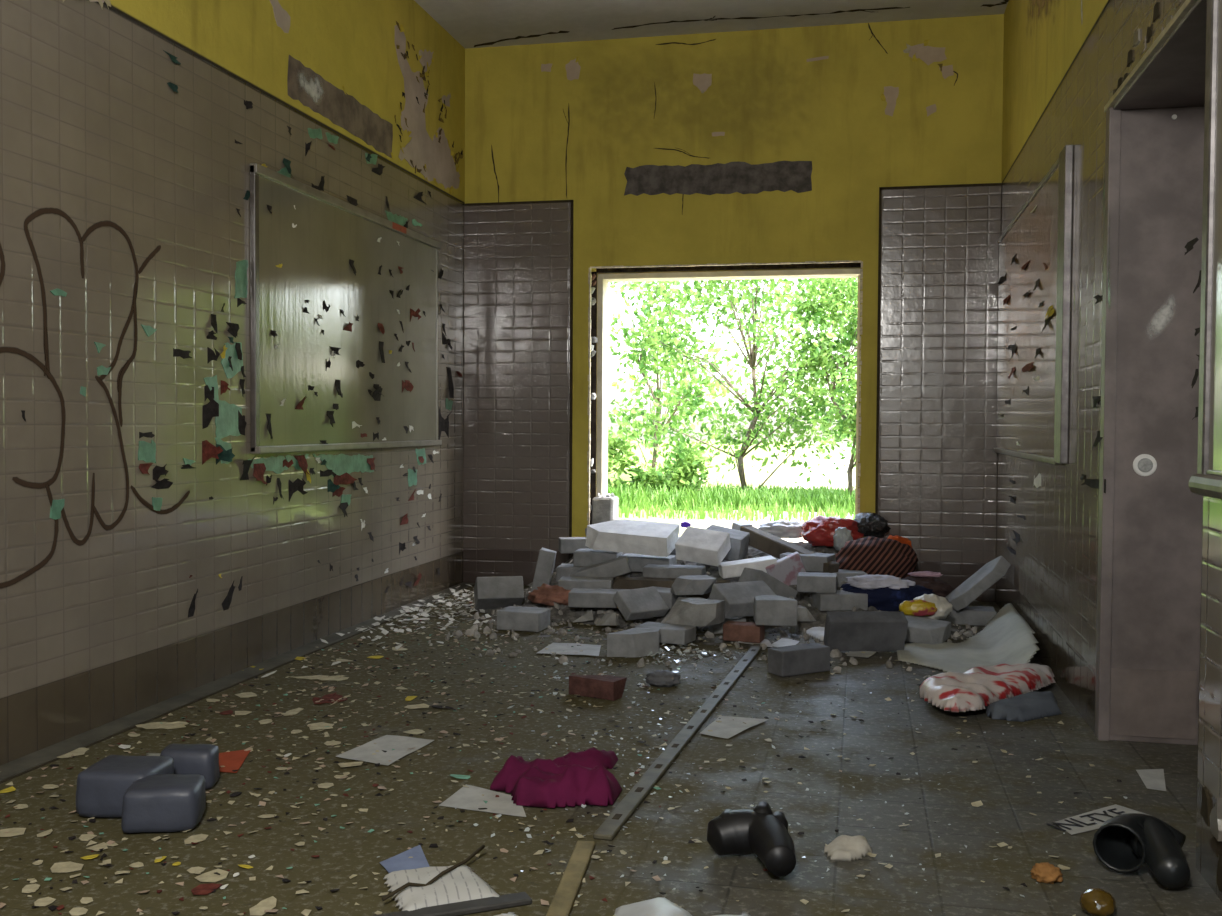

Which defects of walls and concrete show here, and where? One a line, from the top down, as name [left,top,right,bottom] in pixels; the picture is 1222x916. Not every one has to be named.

peeling [269,0,291,33]
crack [612,7,910,54]
flaking render [287,21,463,204]
peeling [624,161,812,196]
peeling [138,260,386,542]
peeling [356,265,426,401]
peeling [384,304,462,593]